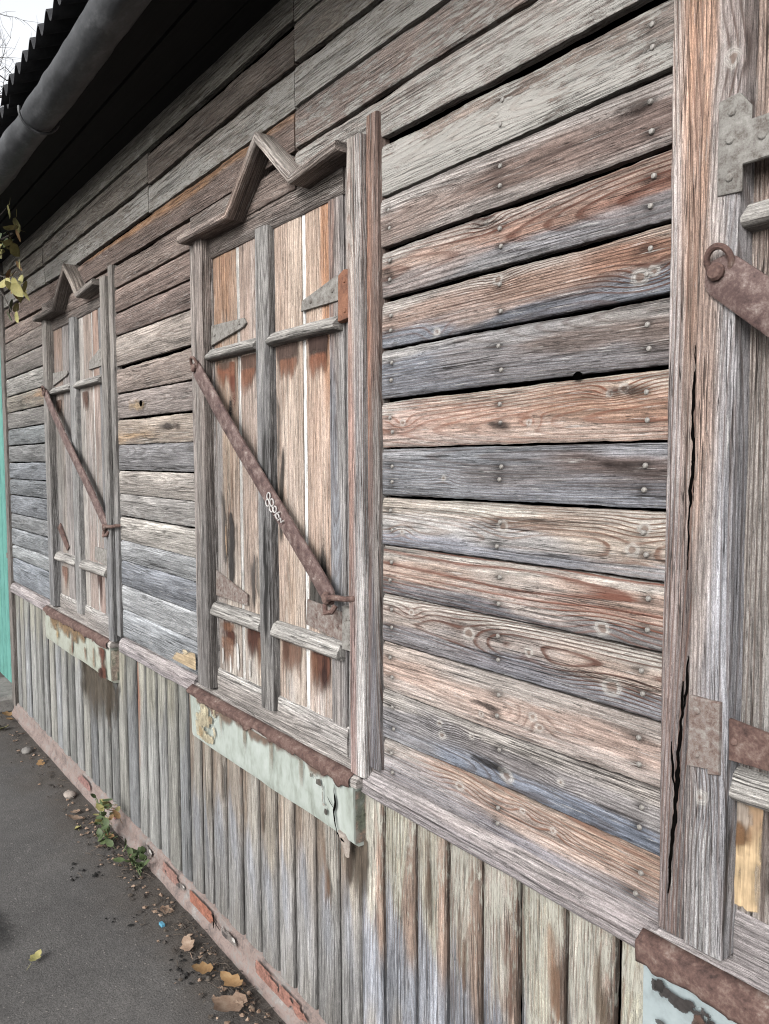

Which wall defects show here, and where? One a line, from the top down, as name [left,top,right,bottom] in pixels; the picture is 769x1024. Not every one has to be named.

corrosion [218,353,256,401]
crack [687,345,696,570]
corrosion [209,708,322,776]
crack [667,656,689,893]
crack [327,793,344,842]
spalling [338,830,351,858]
peeling [651,978,715,1024]